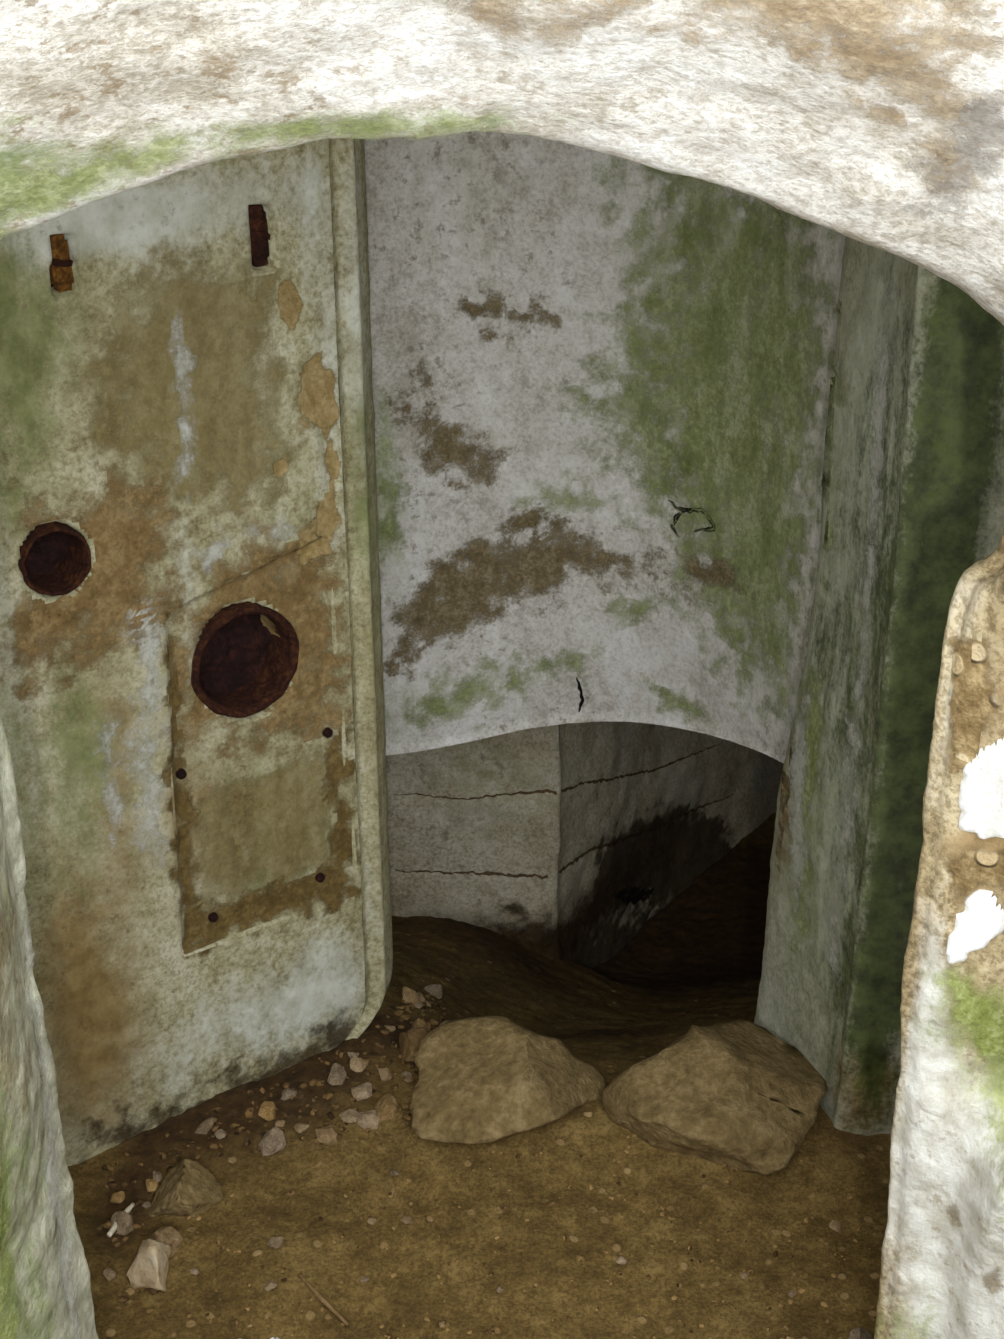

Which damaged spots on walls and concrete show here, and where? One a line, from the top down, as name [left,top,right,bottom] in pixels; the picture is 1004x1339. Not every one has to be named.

rust [11,467,362,958]
water stain [498,804,732,970]